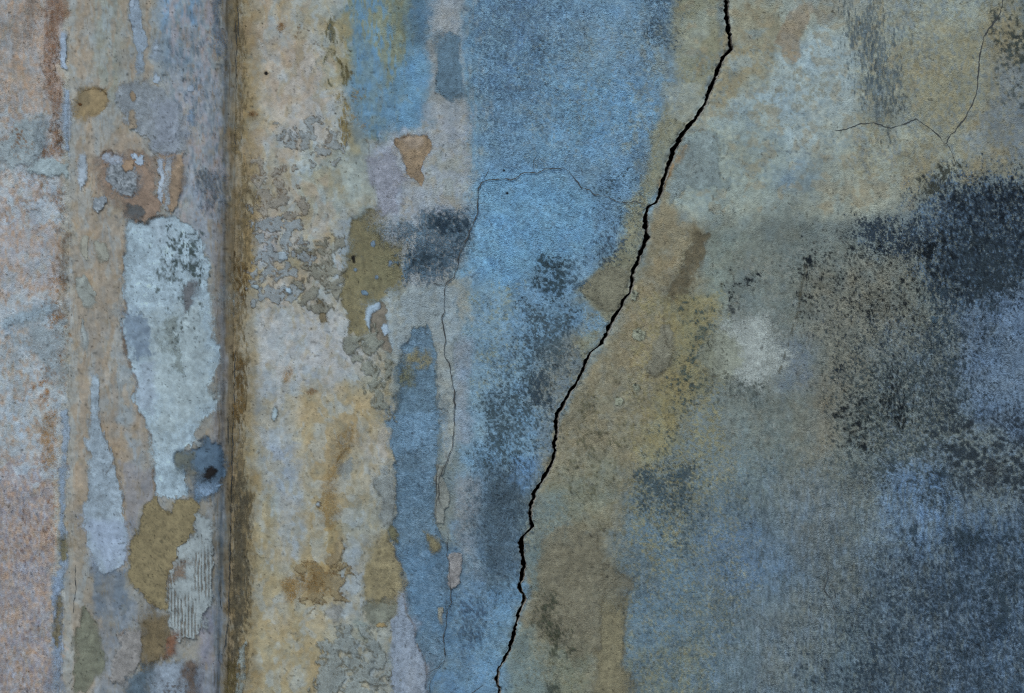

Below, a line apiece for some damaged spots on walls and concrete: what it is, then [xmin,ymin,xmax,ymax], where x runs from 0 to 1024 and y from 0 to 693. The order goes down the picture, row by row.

peeling [52,149,226,693]
peeling [274,116,347,168]
peeling [245,135,462,693]
crack [429,540,452,693]
crack [434,0,734,693]
leakage [769,153,1024,693]
crack [836,0,1003,168]